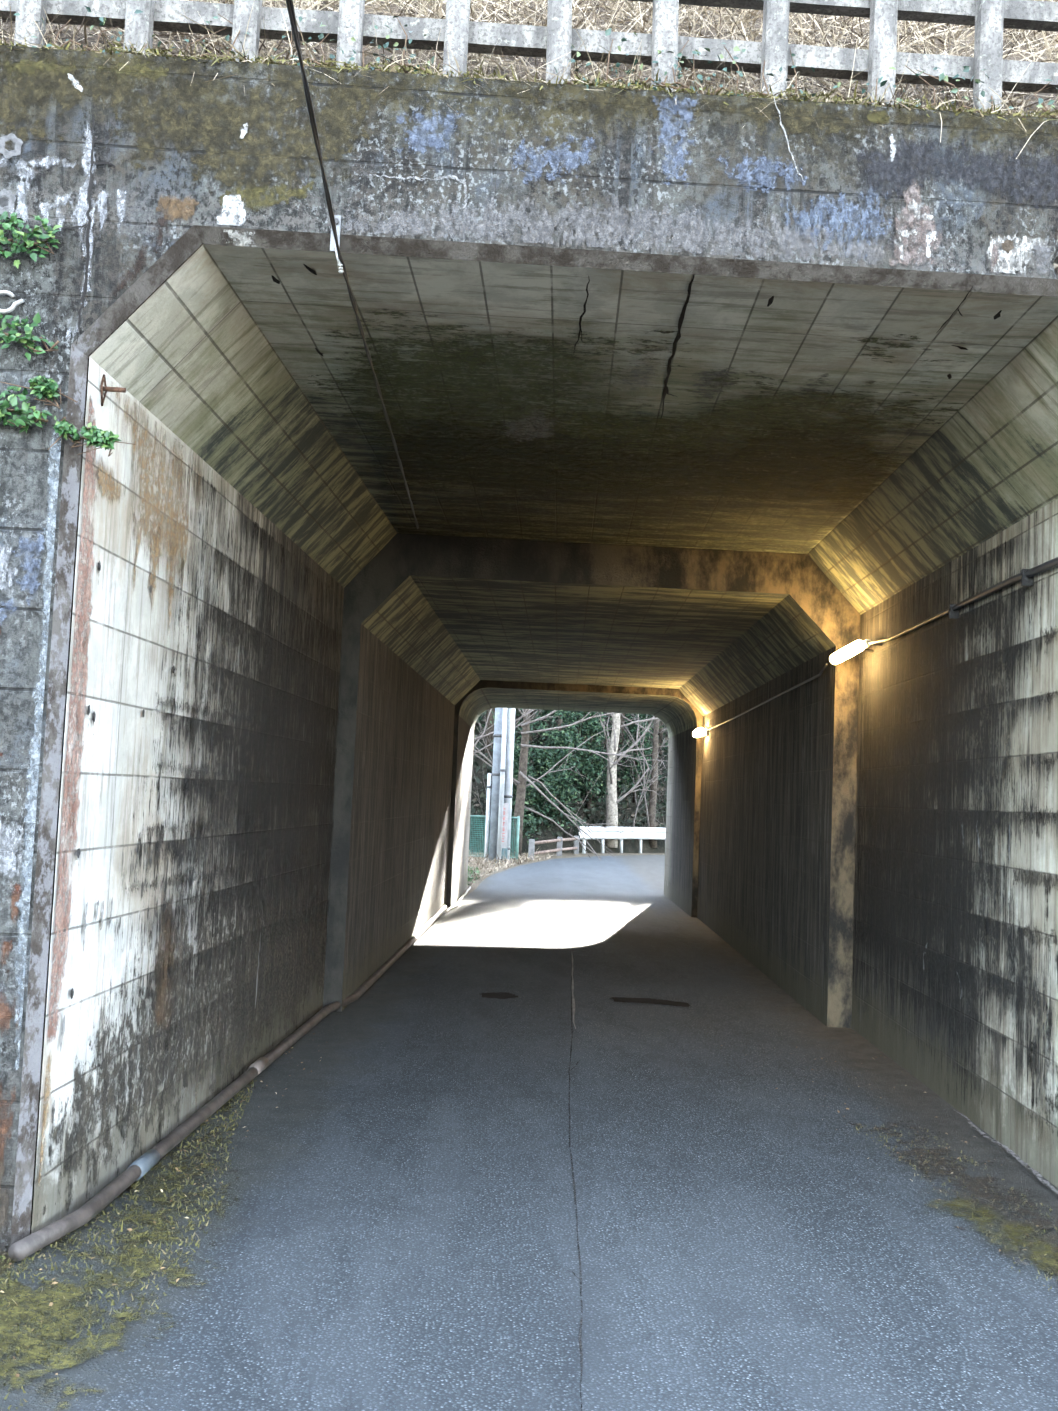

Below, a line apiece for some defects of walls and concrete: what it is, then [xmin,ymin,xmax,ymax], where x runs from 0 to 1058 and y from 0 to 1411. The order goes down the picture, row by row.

crack [573,276,590,355]
crack [658,273,695,417]
spalling [987,230,1058,274]
corrosion [10,882,22,922]
leakage [43,392,345,1217]
leakage [852,540,1058,1141]